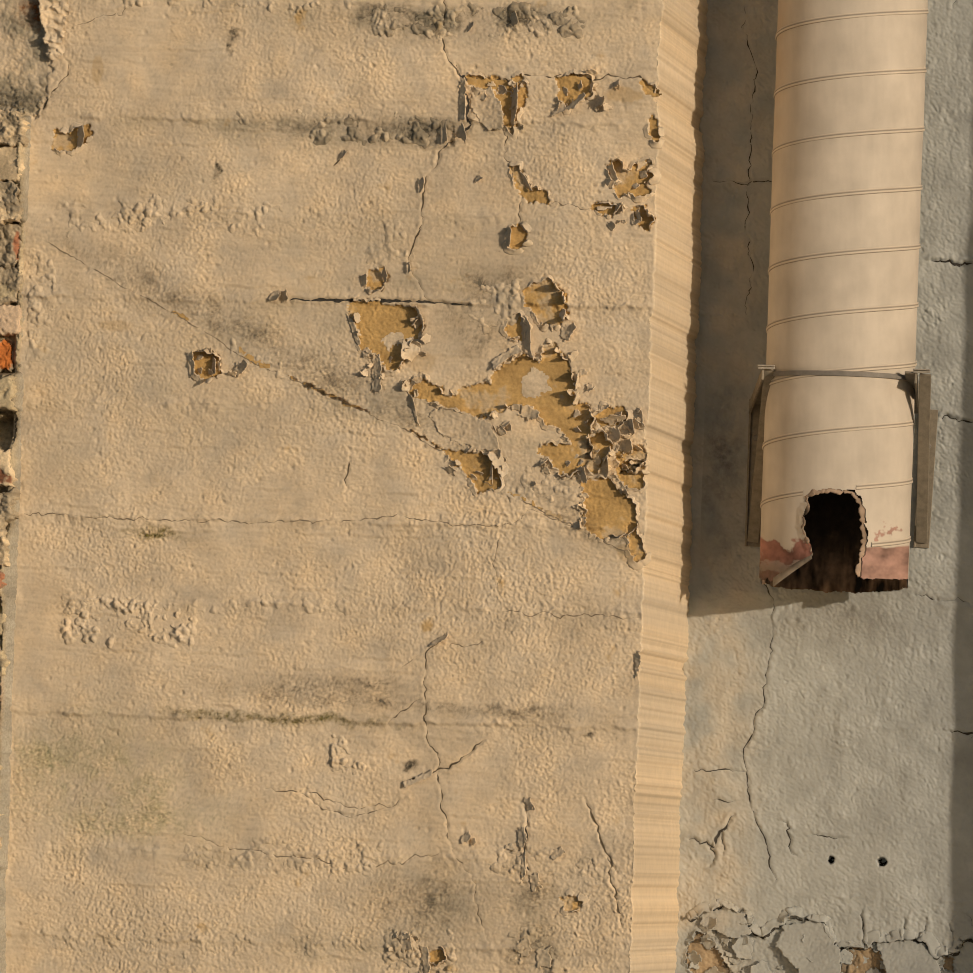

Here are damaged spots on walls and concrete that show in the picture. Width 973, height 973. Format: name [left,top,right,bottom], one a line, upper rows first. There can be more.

peeling [549,68,613,117]
crack [291,0,654,305]
peeling [507,161,551,205]
peeling [590,115,665,231]
crack [723,7,772,307]
crack [934,259,972,267]
peeling [188,348,248,385]
crack [50,243,446,454]
peeling [346,265,652,570]
crack [24,470,636,586]
crack [185,642,488,941]
peeling [680,899,973,973]